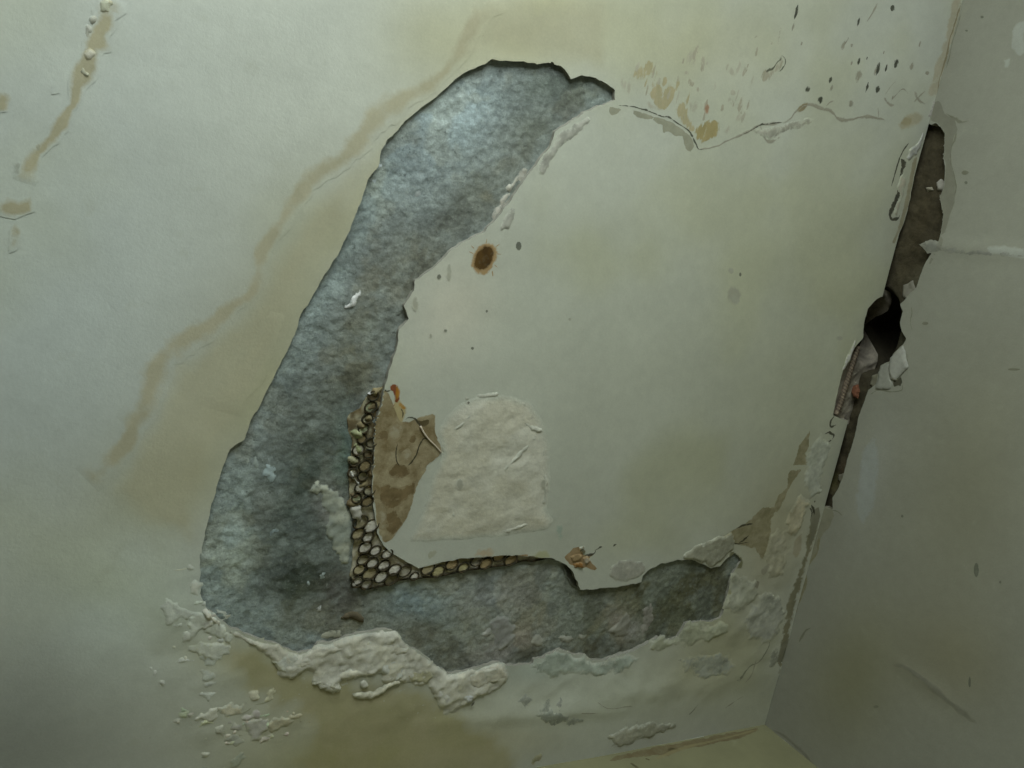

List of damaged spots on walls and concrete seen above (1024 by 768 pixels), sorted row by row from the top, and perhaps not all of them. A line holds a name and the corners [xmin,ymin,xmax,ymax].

leakage [0,0,127,253]
crack [609,0,962,243]
leakage [75,0,612,554]
rust [469,239,501,276]
spalling [160,27,945,768]